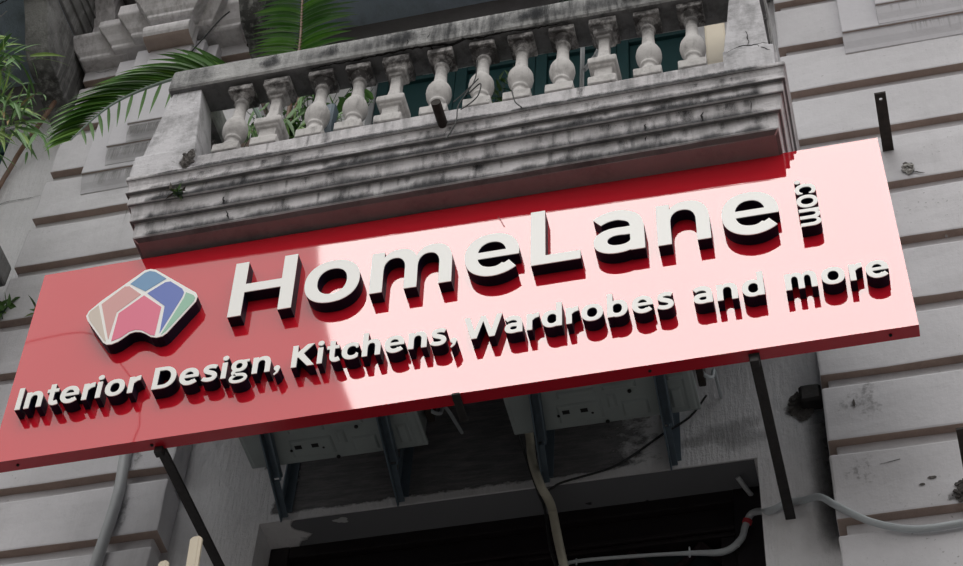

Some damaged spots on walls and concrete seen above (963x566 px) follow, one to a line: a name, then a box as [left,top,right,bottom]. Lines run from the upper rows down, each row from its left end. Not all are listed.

crack [728,31,770,52]
flaking render [950,478,963,502]